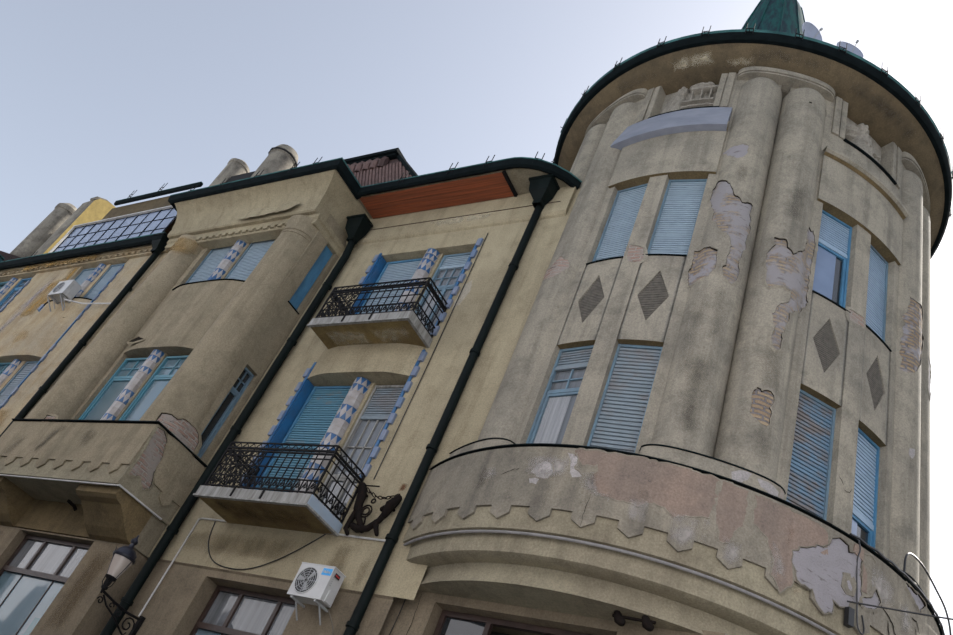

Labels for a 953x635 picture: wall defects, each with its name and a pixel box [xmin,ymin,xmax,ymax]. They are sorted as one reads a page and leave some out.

spalling [706,179,754,286]
spalling [761,225,818,353]
spalling [895,295,932,400]
spalling [125,411,202,493]
spalling [745,386,778,430]
peeling [528,448,882,615]